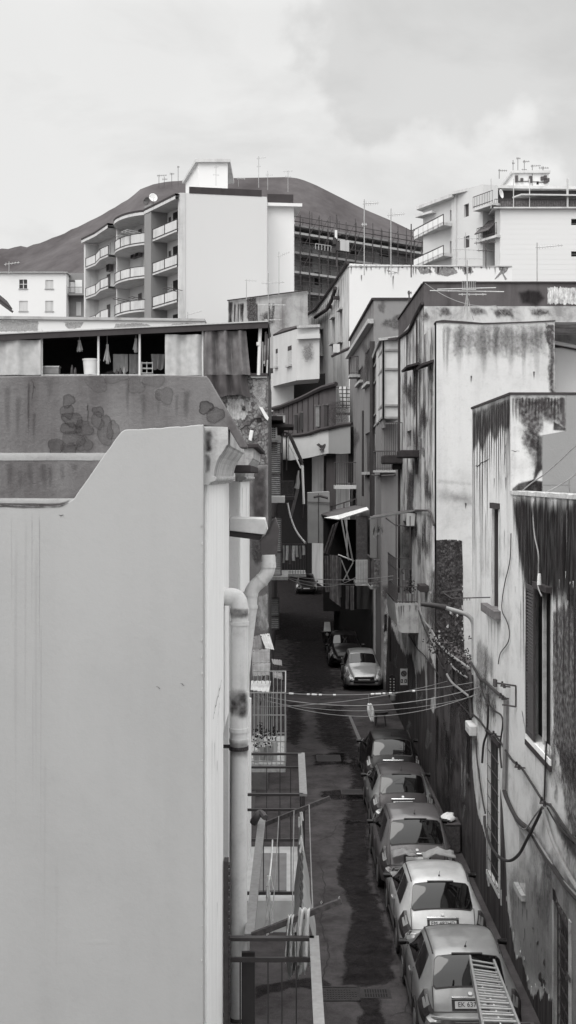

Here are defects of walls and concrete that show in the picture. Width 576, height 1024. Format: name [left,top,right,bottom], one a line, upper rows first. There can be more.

damp [199,401,225,469]
flaking render [227,398,262,424]
peeling [383,538,464,797]
damp [473,397,576,857]